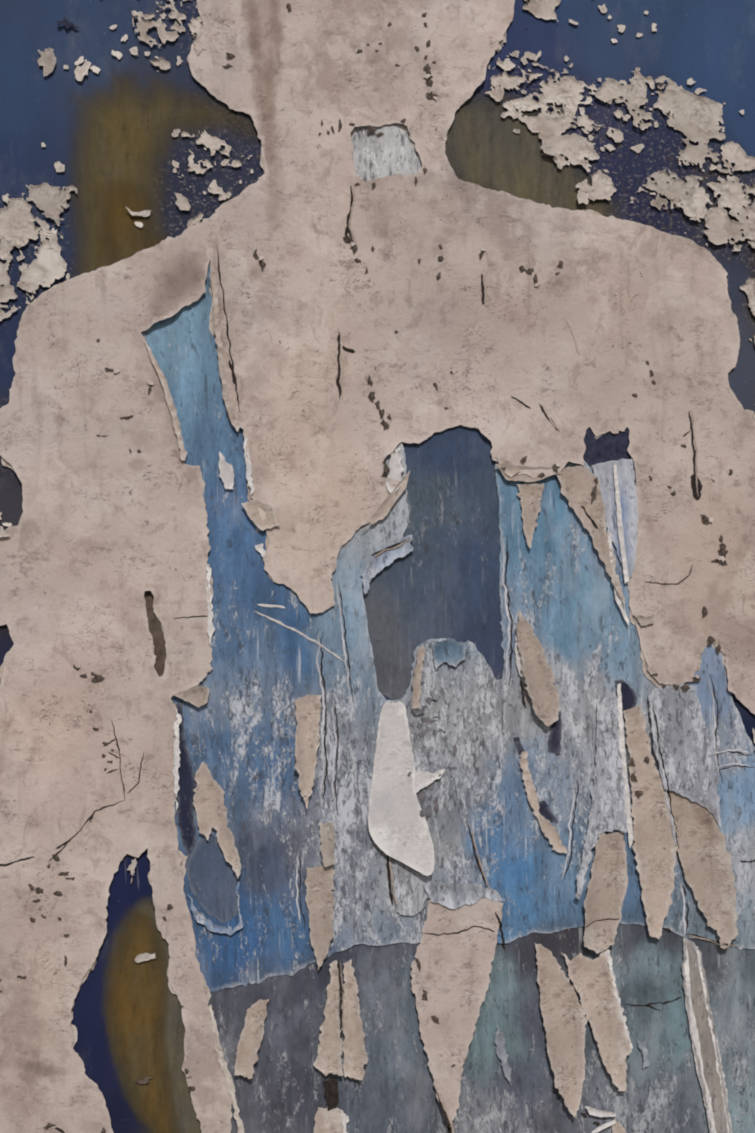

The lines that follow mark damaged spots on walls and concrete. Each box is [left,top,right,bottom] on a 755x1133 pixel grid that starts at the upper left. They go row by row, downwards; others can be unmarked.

peeling [131,0,186,48]
peeling [0,183,77,321]
damp [76,83,253,273]
peeling [171,129,252,178]
damp [445,99,612,217]
peeling [485,51,755,251]
crack [0,720,144,867]
damp [106,900,202,1133]
peeling [234,999,269,1079]
peeling [305,822,368,1133]
peeling [368,701,503,1121]
peeling [681,937,732,1133]